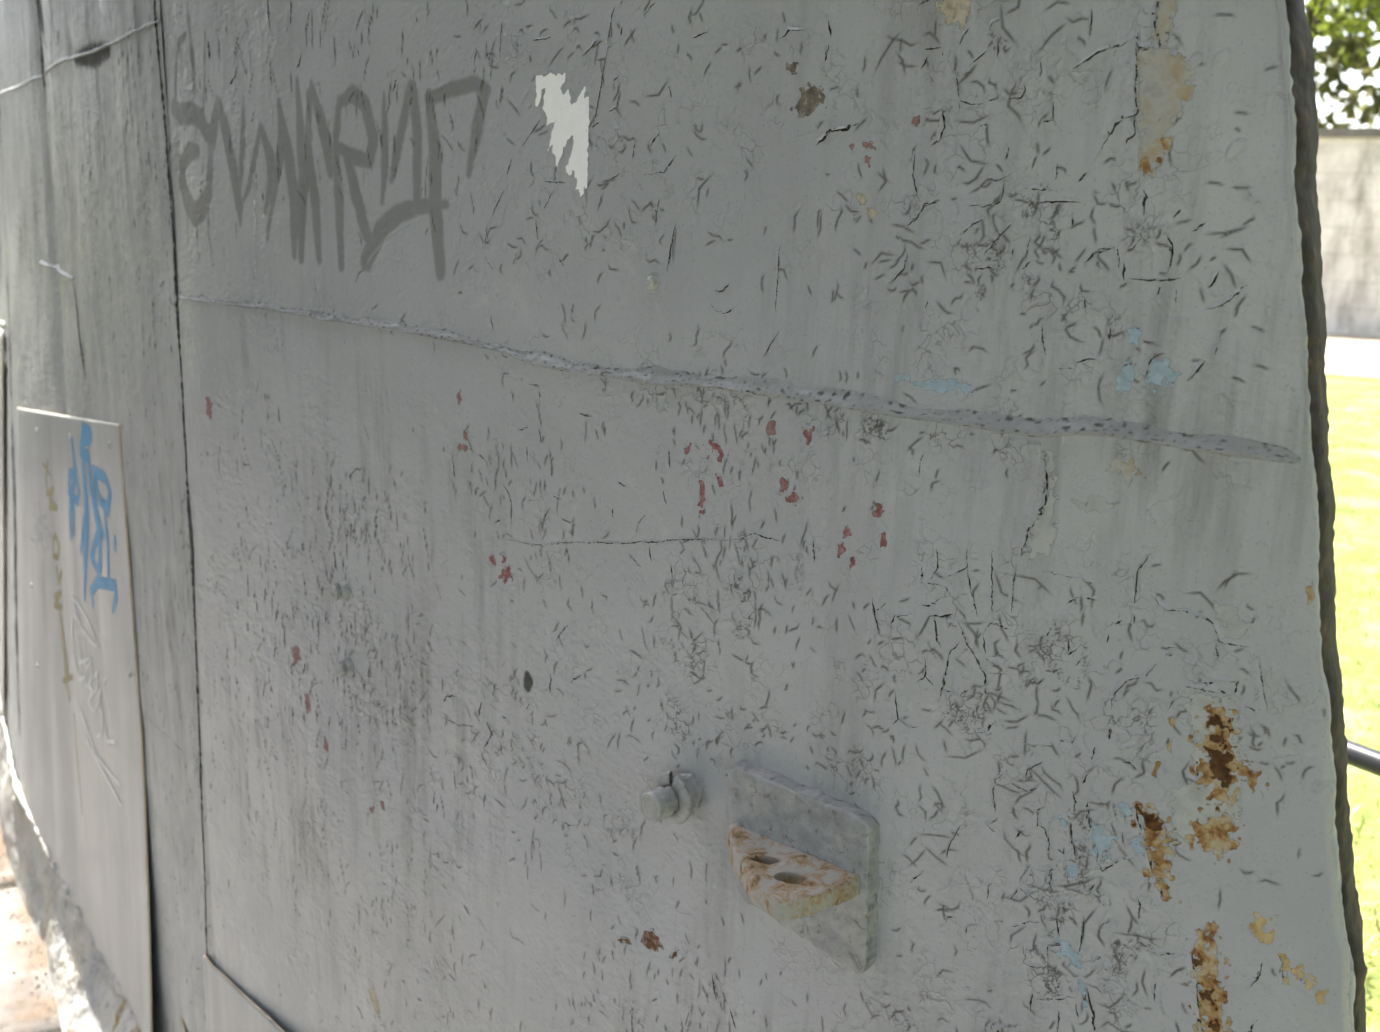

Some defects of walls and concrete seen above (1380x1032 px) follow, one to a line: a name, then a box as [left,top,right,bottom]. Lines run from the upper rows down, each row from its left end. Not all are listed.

peeling [1133,0,1198,181]
crack [452,381,815,579]
peeling [682,439,729,516]
peeling [779,470,803,509]
peeling [834,524,859,571]
peeling [872,500,890,550]
peeling [1050,800,1152,882]
corrosion [1130,698,1269,905]
peeling [1167,689,1248,861]
peeling [1051,936,1090,1010]
corrosion [1184,918,1241,1032]
peeling [1247,911,1329,1004]